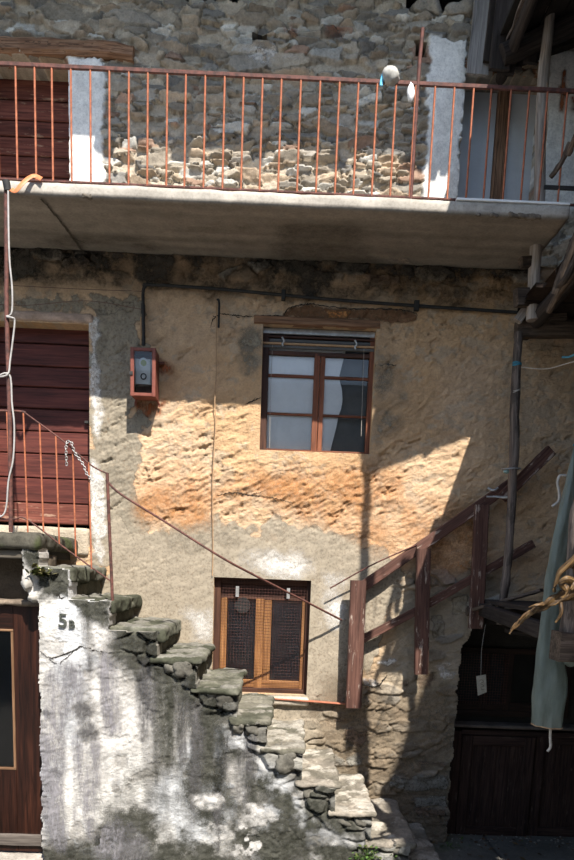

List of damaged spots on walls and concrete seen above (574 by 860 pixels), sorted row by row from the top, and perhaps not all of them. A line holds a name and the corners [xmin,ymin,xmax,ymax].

crack [40,199,85,251]
corrosion [136,401,164,418]
flaking render [0,290,416,766]
leakage [26,550,69,599]
crack [40,646,117,664]
spalling [402,673,434,688]
leakage [39,603,347,860]